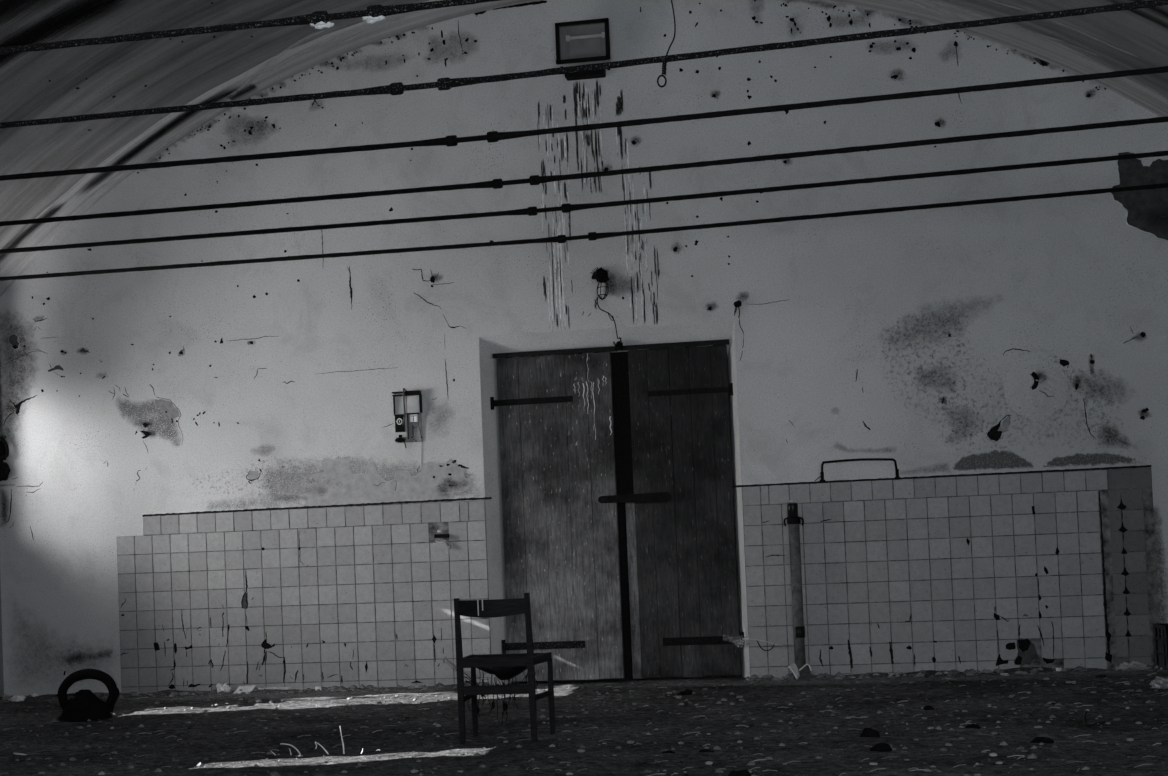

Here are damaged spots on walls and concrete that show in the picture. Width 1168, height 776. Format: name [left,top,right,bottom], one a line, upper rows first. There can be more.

leakage [537,81,603,330]
leakage [615,91,660,323]
spalling [1111,152,1168,241]
spalling [41,349,101,392]
peeling [102,364,183,450]
peeling [246,456,474,507]
leakage [955,422,1134,470]